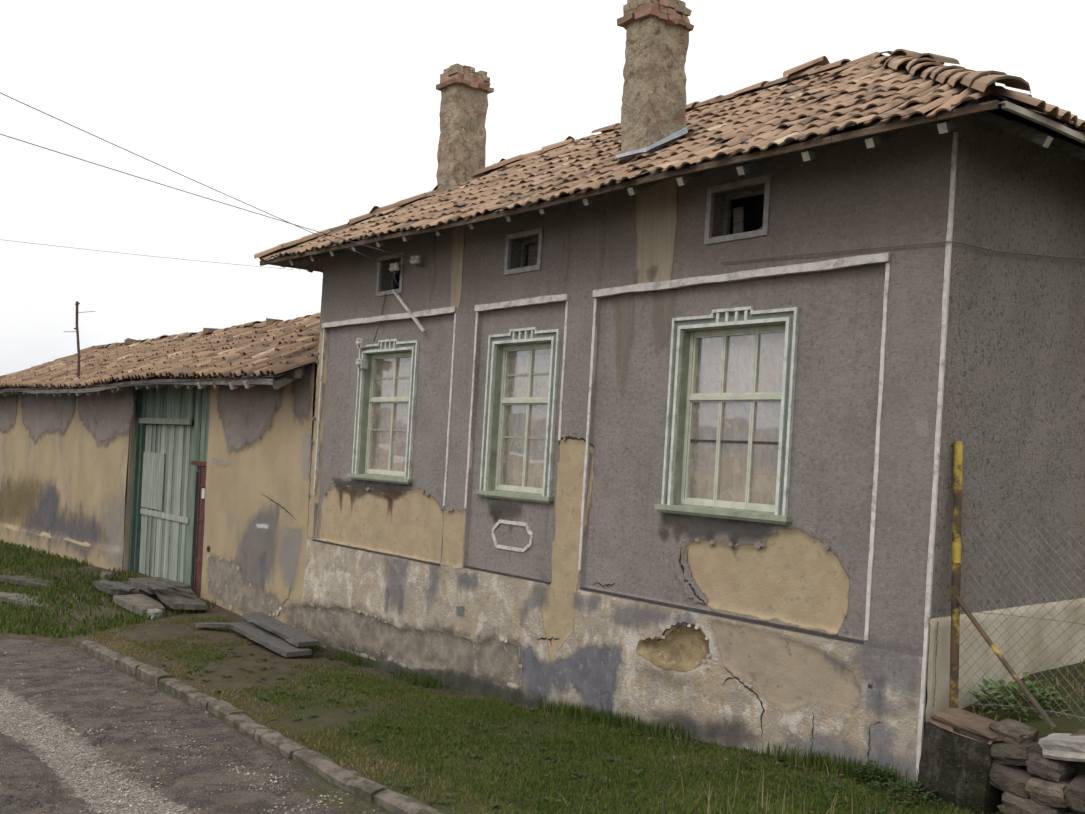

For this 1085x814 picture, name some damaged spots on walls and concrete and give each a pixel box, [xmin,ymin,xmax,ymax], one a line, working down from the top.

flaking render [0,386,134,446]
flaking render [217,329,466,569]
water stain [0,482,123,554]
water stain [238,511,300,585]
flaking render [541,436,595,662]
crack [679,547,706,605]
flaking render [675,529,850,634]
water stain [319,642,622,720]
flaking render [636,621,711,675]
crack [723,667,765,738]